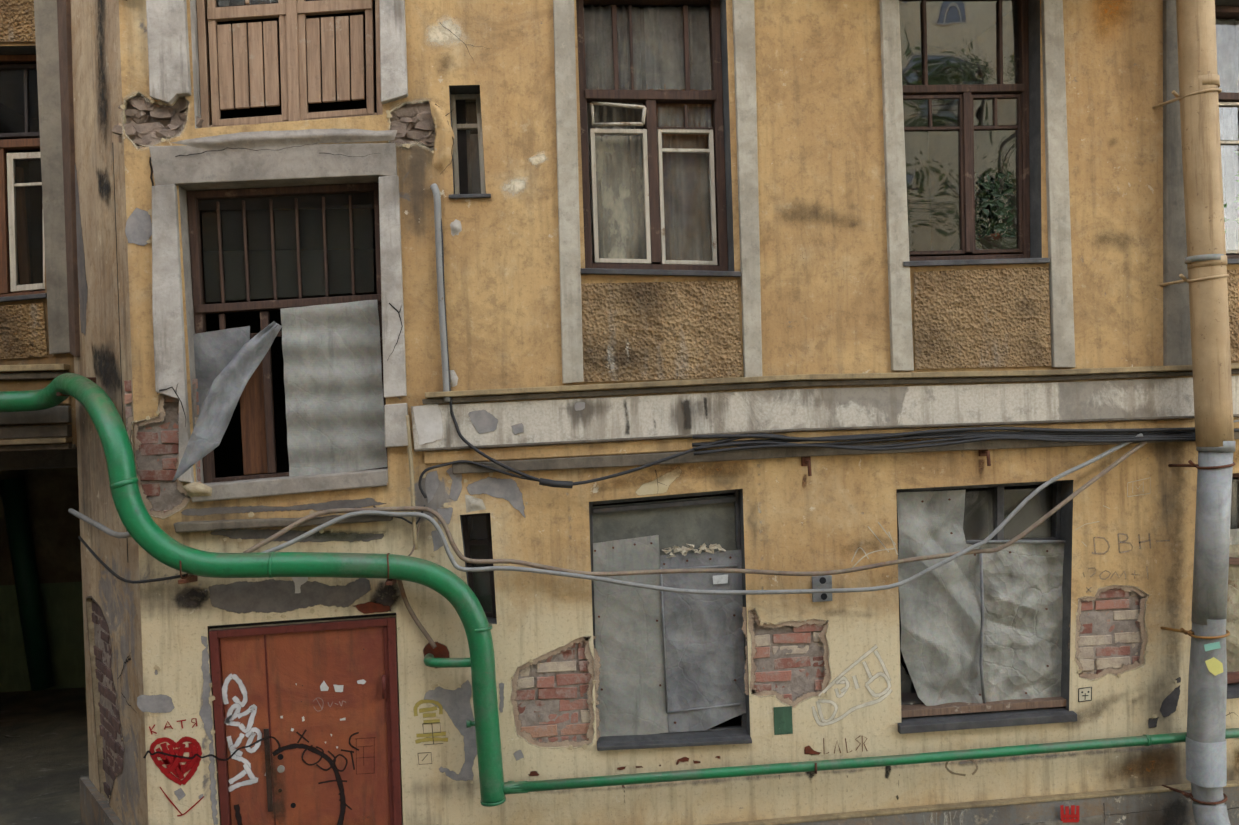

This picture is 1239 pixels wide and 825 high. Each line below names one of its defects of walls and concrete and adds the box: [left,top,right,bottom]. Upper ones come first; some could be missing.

flaking render [111,92,204,149]
flaking render [380,100,437,153]
flaking render [124,379,199,519]
flaking render [86,596,125,804]
flaking render [499,636,601,761]
flaking render [741,607,831,707]
flaking render [1068,585,1149,681]